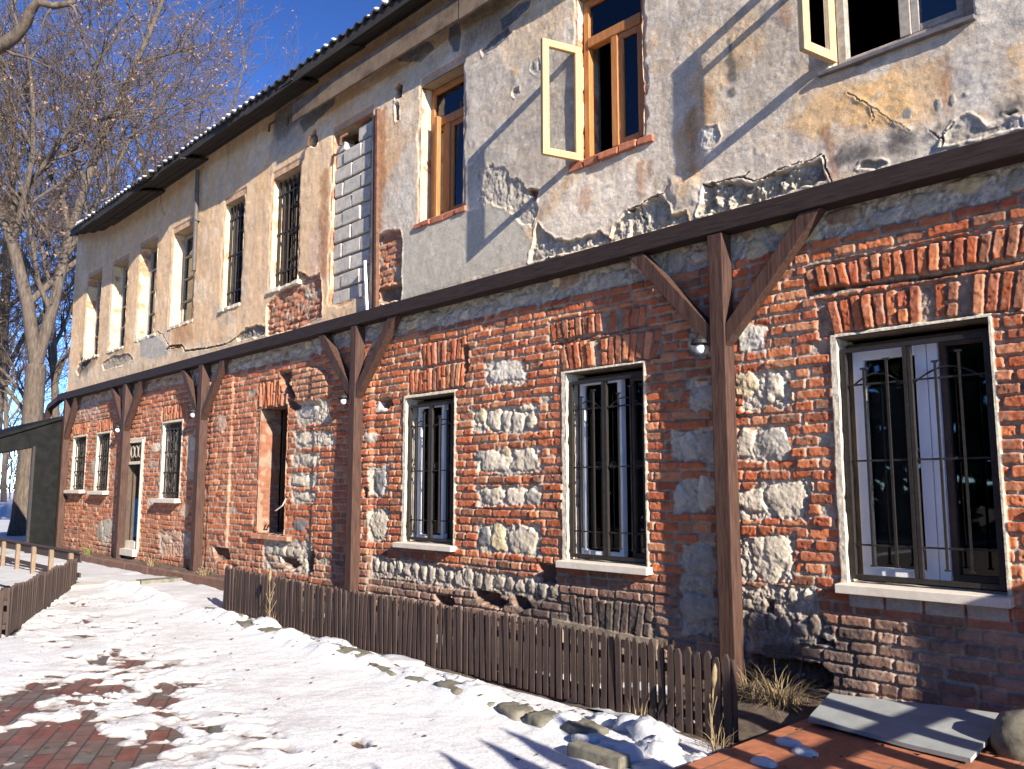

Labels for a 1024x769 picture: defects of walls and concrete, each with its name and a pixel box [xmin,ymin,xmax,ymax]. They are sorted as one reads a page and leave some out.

spalling [695,122,723,153]
crack [847,92,954,146]
peeling [935,105,1024,151]
spalling [855,156,891,172]
spalling [472,154,832,265]
spalling [379,226,403,306]
spalling [236,268,324,343]
spalling [75,337,140,376]
crack [157,329,249,352]